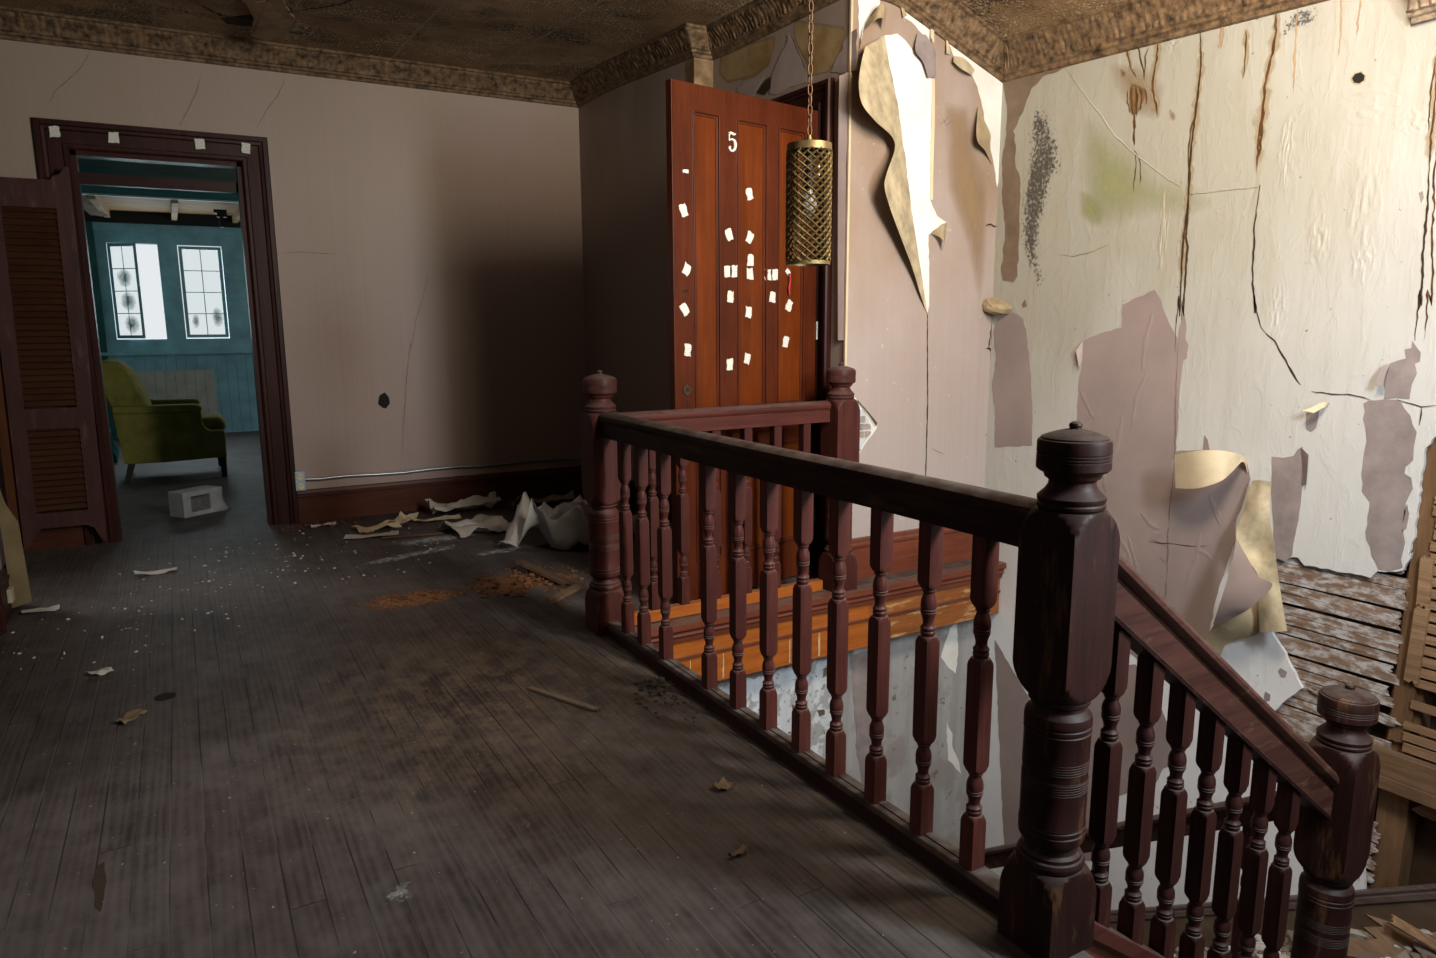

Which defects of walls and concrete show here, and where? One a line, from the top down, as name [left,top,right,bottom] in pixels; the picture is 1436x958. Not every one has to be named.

peeling [858,0,1003,313]
leakage [1021,111,1058,281]
corrosion [1122,43,1161,190]
crack [1066,32,1436,425]
corrosion [1256,14,1279,165]